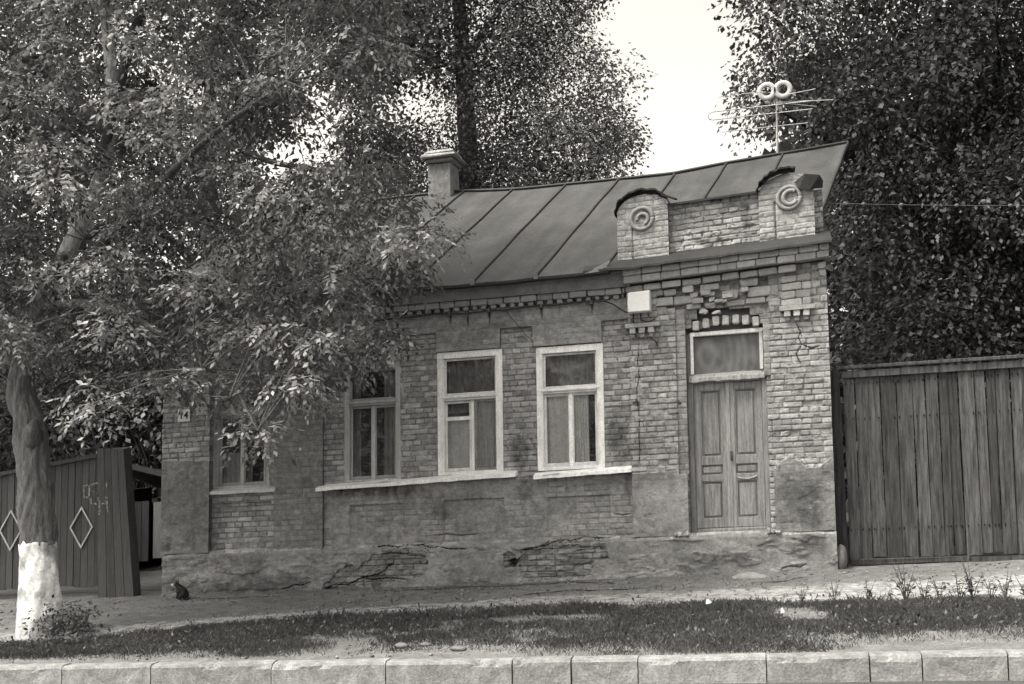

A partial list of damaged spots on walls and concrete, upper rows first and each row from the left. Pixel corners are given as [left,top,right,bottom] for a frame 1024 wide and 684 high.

spalling [324,548,428,589]
spalling [503,538,611,581]